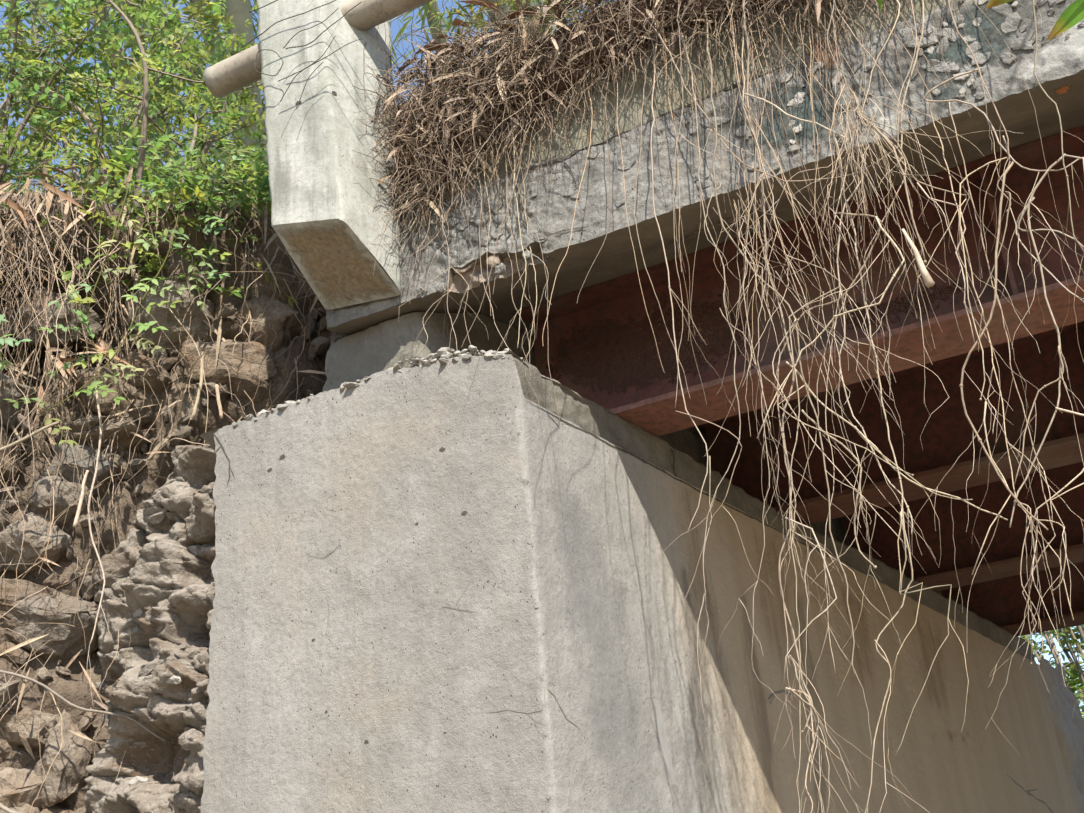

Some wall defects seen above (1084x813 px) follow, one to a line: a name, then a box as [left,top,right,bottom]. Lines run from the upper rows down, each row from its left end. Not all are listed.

crack [361,42,369,101]
corrosion [838,280,964,329]
corrosion [540,294,754,396]